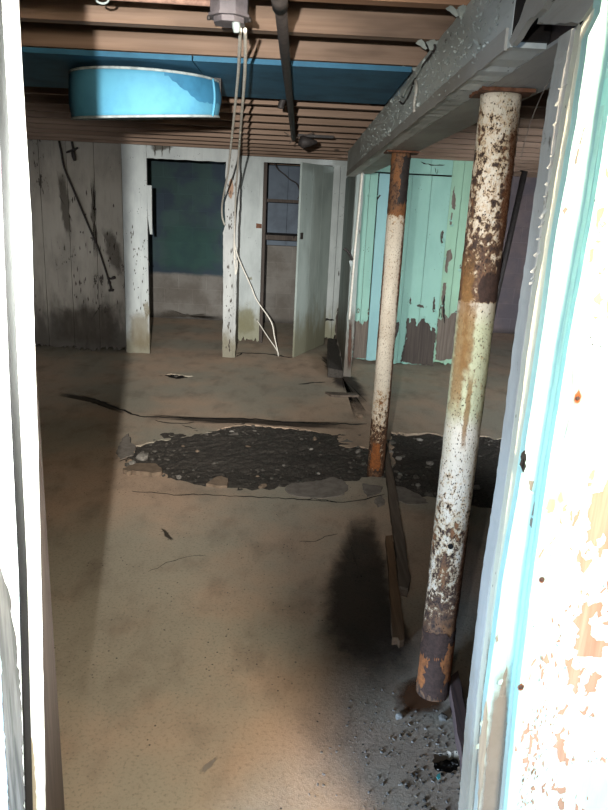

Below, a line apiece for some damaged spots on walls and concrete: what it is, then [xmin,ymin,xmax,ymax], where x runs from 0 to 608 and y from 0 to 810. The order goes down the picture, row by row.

leakage [59,180,71,230]
leakage [91,188,121,269]
corrosion [397,155,411,204]
peeling [440,187,461,273]
corrosion [498,131,518,235]
leakage [63,308,114,342]
peeling [395,283,457,366]
corrosion [451,260,502,439]
crack [85,397,362,429]
peeling [528,467,608,718]
corrosion [397,628,457,713]
peeling [552,726,575,766]